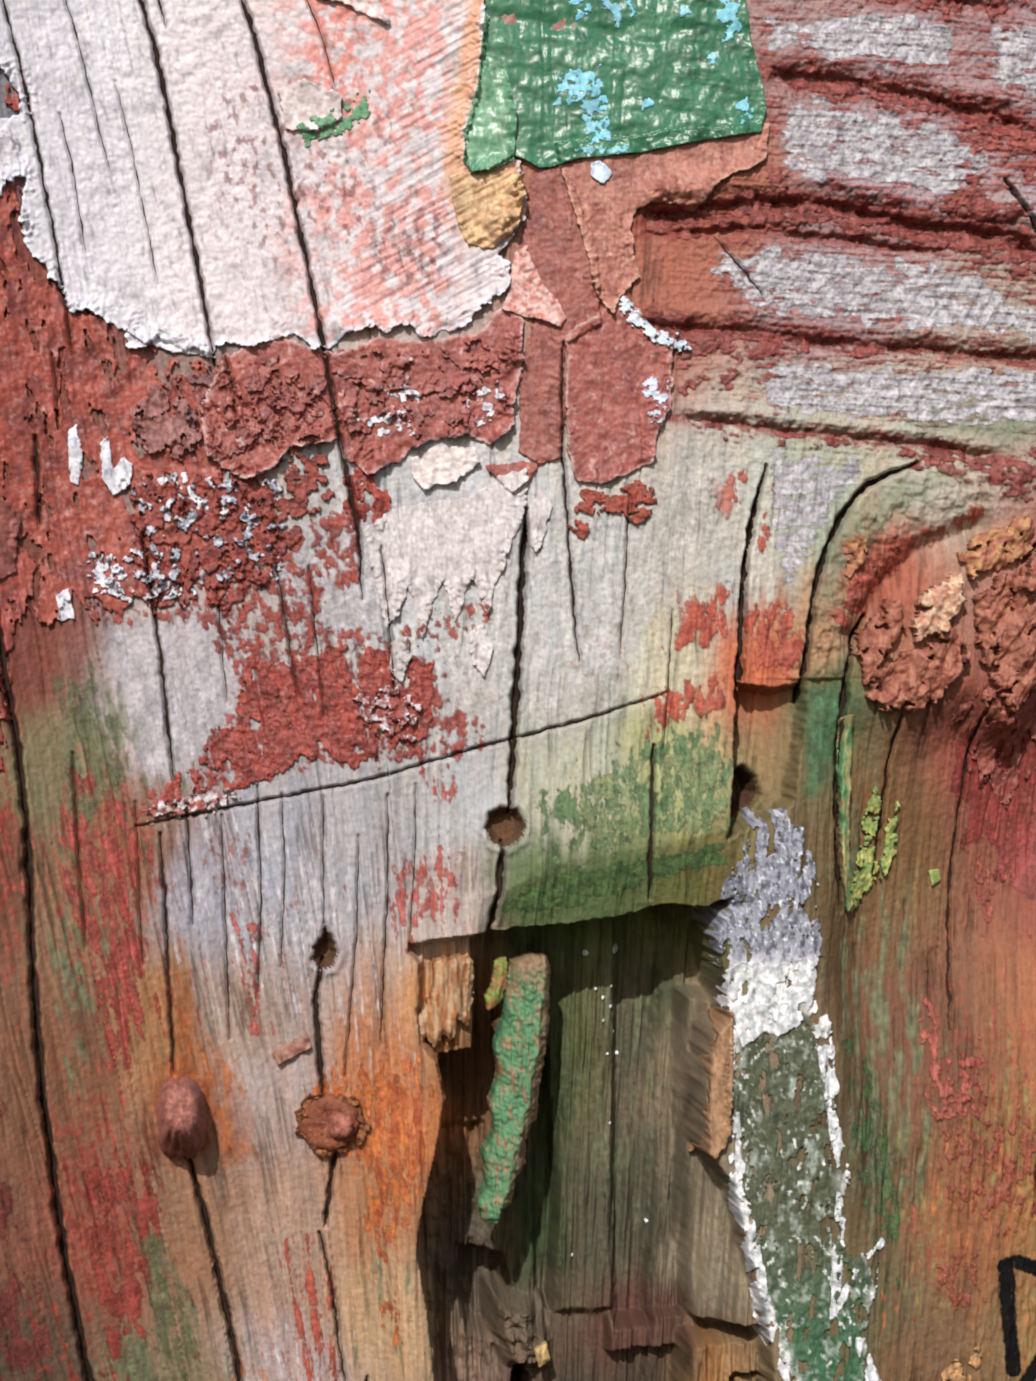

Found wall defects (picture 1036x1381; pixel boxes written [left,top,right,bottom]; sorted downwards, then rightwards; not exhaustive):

crack [1010,192,1036,233]
peeling [0,0,770,770]
crack [560,346,580,661]
peeling [145,640,435,825]
crack [135,496,673,1096]
peeling [834,714,901,912]
corrosion [172,1059,236,1156]
corrosion [312,1049,435,1262]
peeling [687,807,885,1381]
crack [189,1159,241,1381]
crack [319,1153,368,1381]
corrosion [380,1293,411,1347]